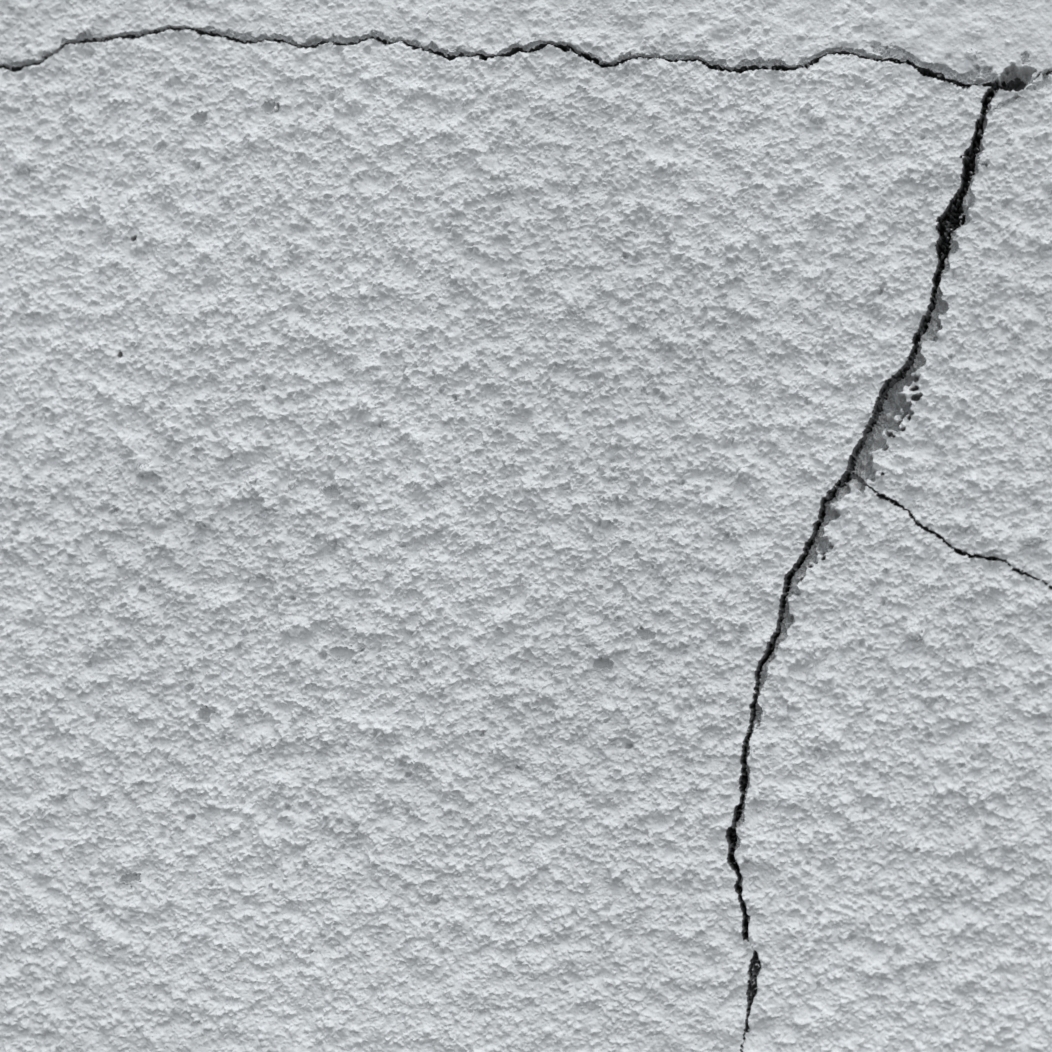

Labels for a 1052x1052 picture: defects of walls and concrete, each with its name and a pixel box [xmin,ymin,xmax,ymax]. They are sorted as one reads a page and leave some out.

crack [0,23,999,92]
crack [1036,66,1052,80]
crack [723,88,1052,1052]